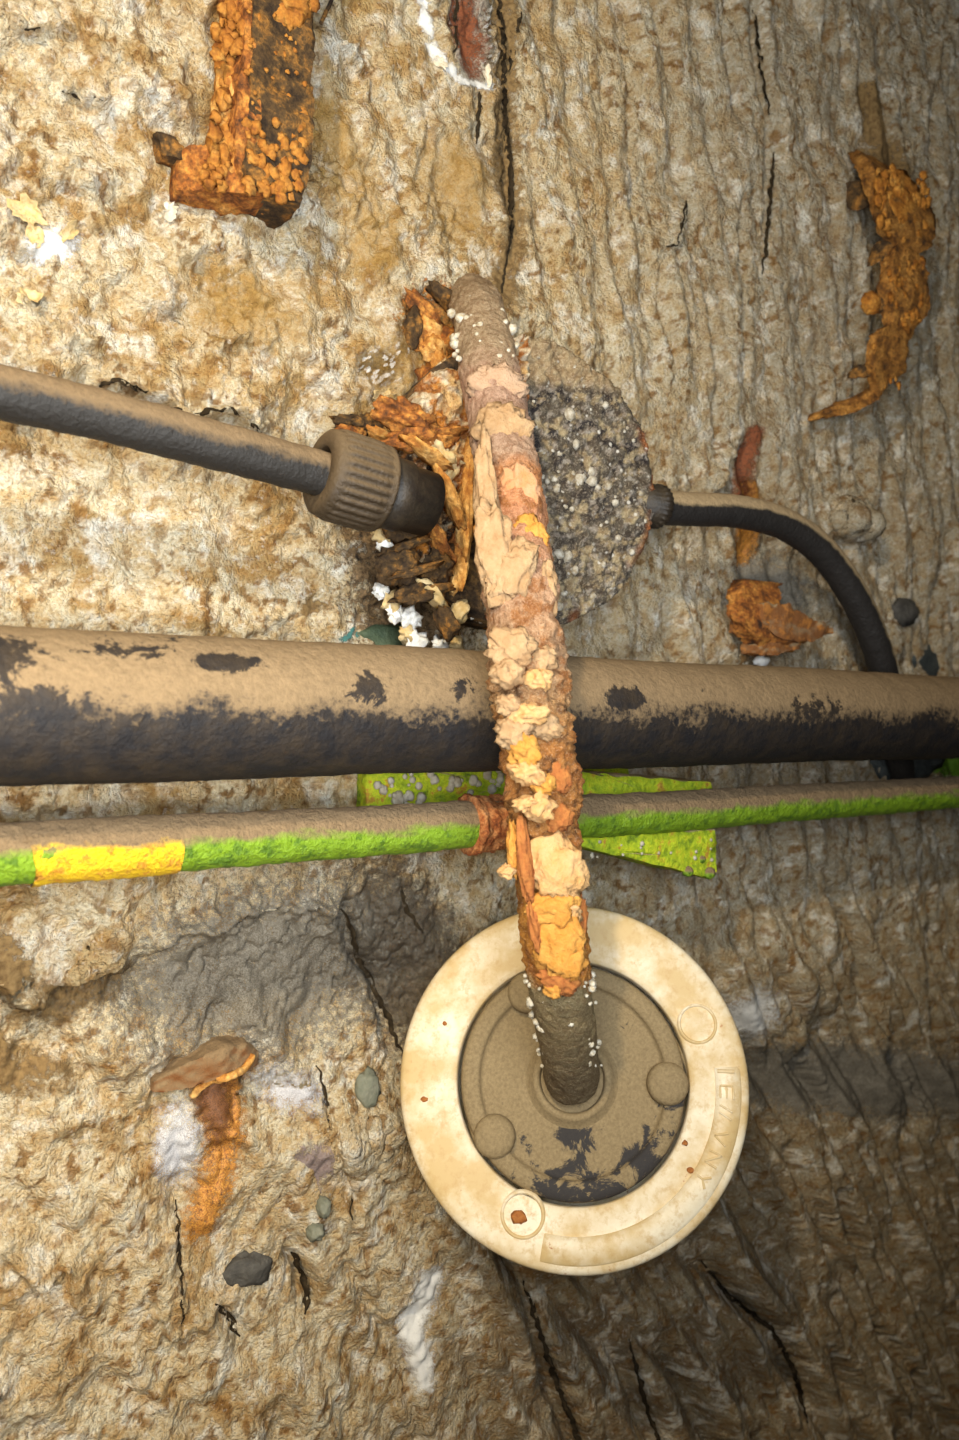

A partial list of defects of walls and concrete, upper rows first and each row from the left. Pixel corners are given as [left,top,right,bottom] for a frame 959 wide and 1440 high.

rust [151,0,320,229]
rust [734,528,761,568]
rust [731,424,766,499]
rust [179,1053,257,1249]